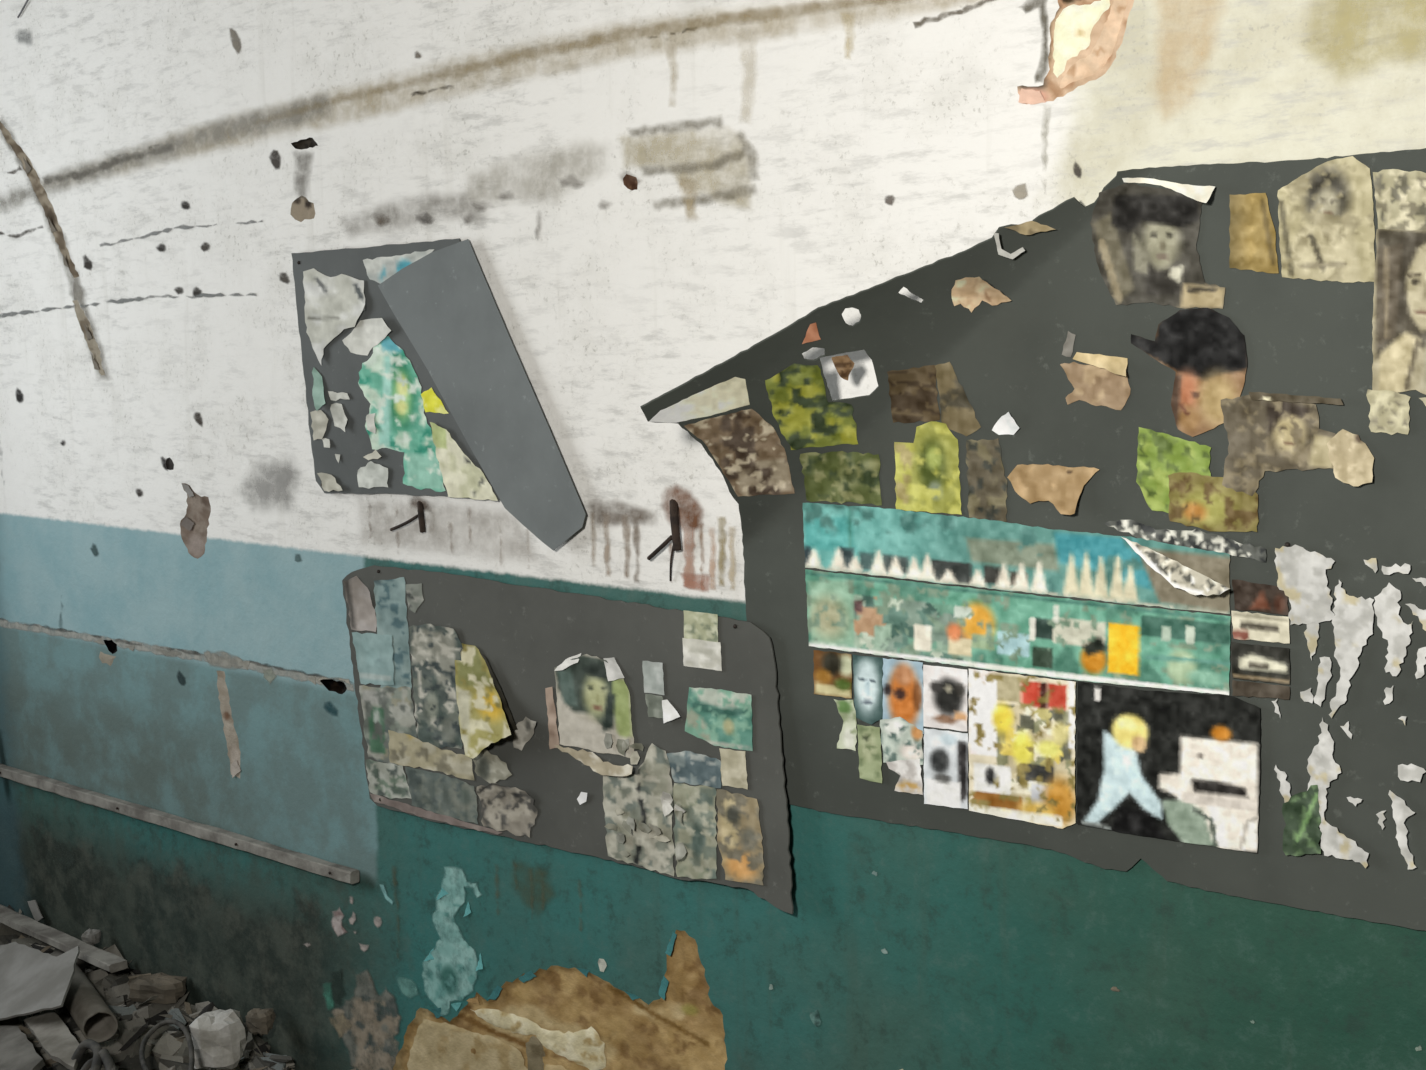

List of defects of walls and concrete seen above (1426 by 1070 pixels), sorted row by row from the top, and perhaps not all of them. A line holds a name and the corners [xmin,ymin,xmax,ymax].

leakage [657,11,778,34]
leakage [914,0,992,27]
flaking render [1017,0,1134,104]
leakage [0,191,30,206]
leakage [44,97,347,188]
leakage [634,122,749,211]
flaking render [161,457,211,559]
flaking render [324,867,727,1070]